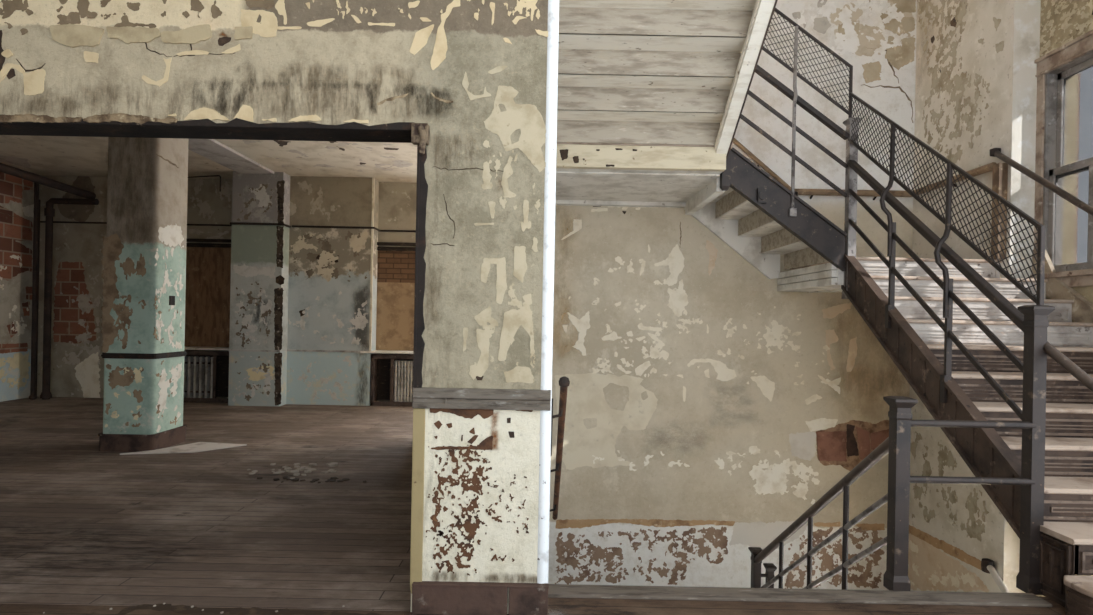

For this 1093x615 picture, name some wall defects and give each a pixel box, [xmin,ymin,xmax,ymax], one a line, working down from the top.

flaking render [0,155,34,290]
flaking render [53,223,229,432]
flaking render [50,0,548,87]
flaking render [232,140,368,405]
peeling [325,141,413,172]
peeling [554,244,804,471]
peeling [777,0,990,164]
crack [863,40,913,123]
peeling [426,408,529,576]
peeling [555,519,885,589]
flaking render [714,418,889,504]
peeling [908,431,989,592]